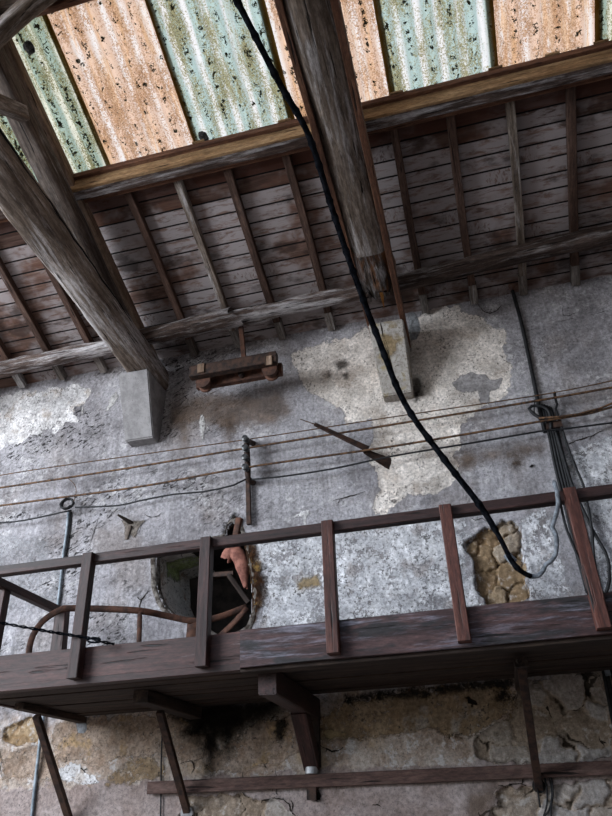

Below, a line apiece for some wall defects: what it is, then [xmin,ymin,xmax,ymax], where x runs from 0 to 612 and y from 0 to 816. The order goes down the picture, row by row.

flaking render [0,383,91,450]
flaking render [290,305,513,515]
peeling [211,536,325,635]
peeling [335,520,453,620]
spalling [453,508,574,606]
flaking render [0,714,300,787]
leakage [188,721,232,774]
leakage [274,719,287,742]
spalling [320,673,612,765]
spalling [188,793,294,816]
spalling [490,778,612,816]